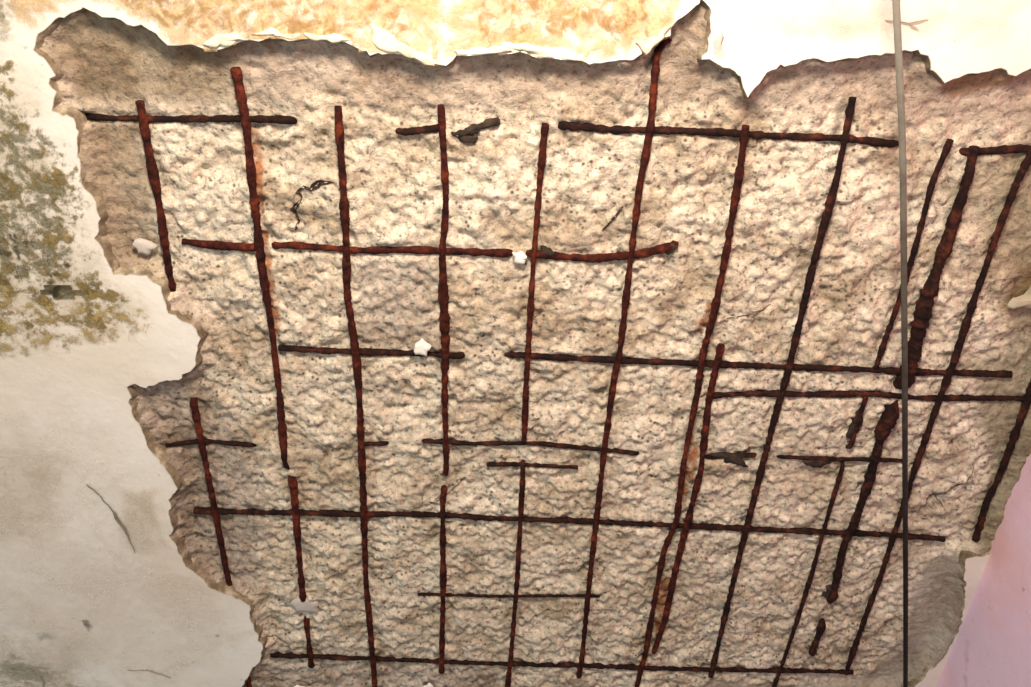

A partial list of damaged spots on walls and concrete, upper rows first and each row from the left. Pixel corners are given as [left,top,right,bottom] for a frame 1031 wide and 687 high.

rust [451,116,500,143]
damp [0,60,145,356]
rust [251,132,268,243]
spalling [34,8,671,687]
spalling [576,0,903,687]
spalling [902,49,1031,687]
rust [683,437,750,502]
rust [802,460,831,468]
rust [846,409,864,439]
rust [654,578,670,634]